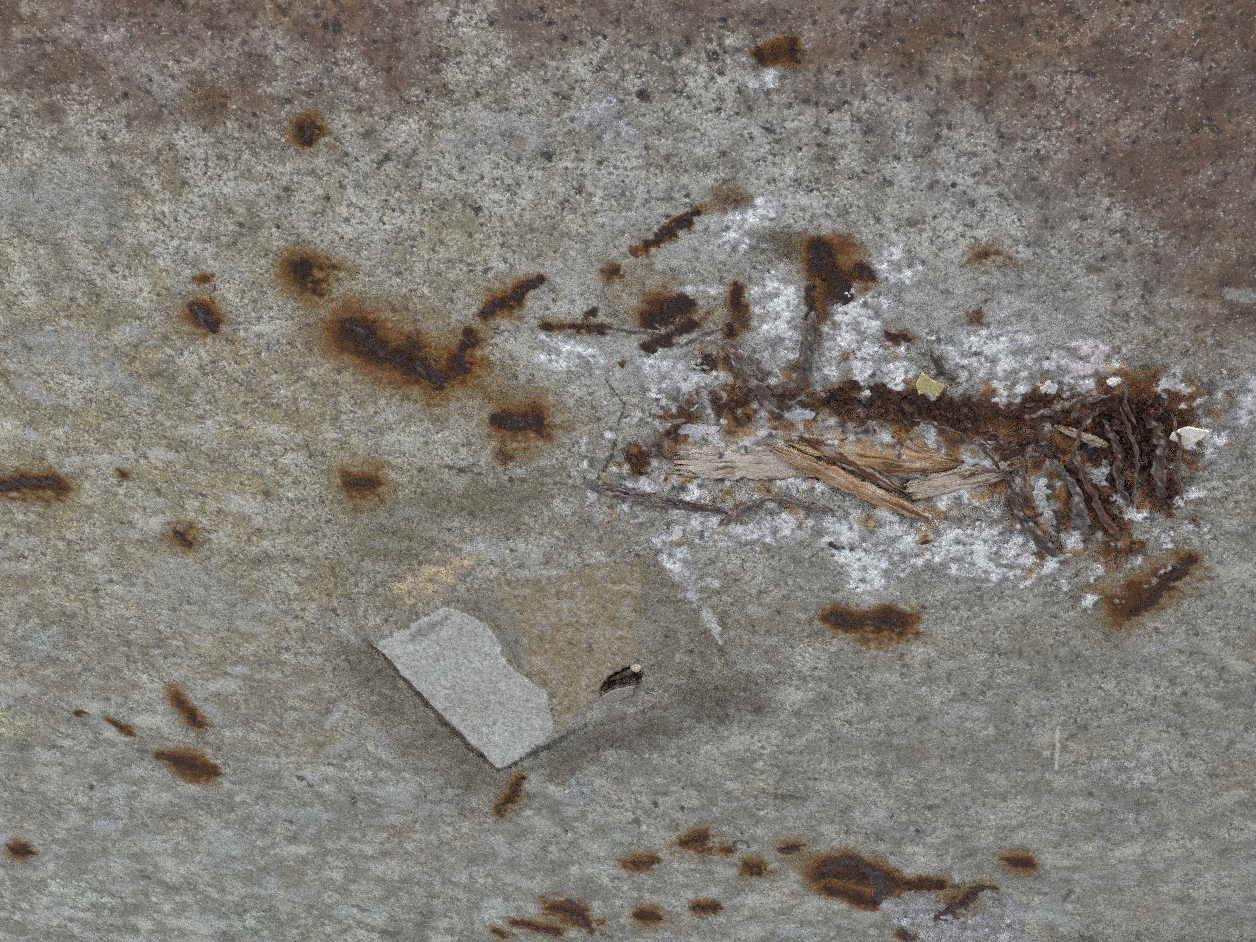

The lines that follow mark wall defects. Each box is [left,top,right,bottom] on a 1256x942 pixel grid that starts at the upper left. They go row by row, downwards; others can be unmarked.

rust [0,466,74,503]
rust [274,246,563,466]
rust [595,190,753,375]
water stain [531,196,1114,403]
rust [796,234,884,390]
water stain [651,504,1072,644]
rust [807,603,927,651]
spalling [560,318,1232,613]
rust [1049,460,1213,631]
water stain [1201,375,1256,460]
rust [152,747,225,785]
rust [775,840,999,925]